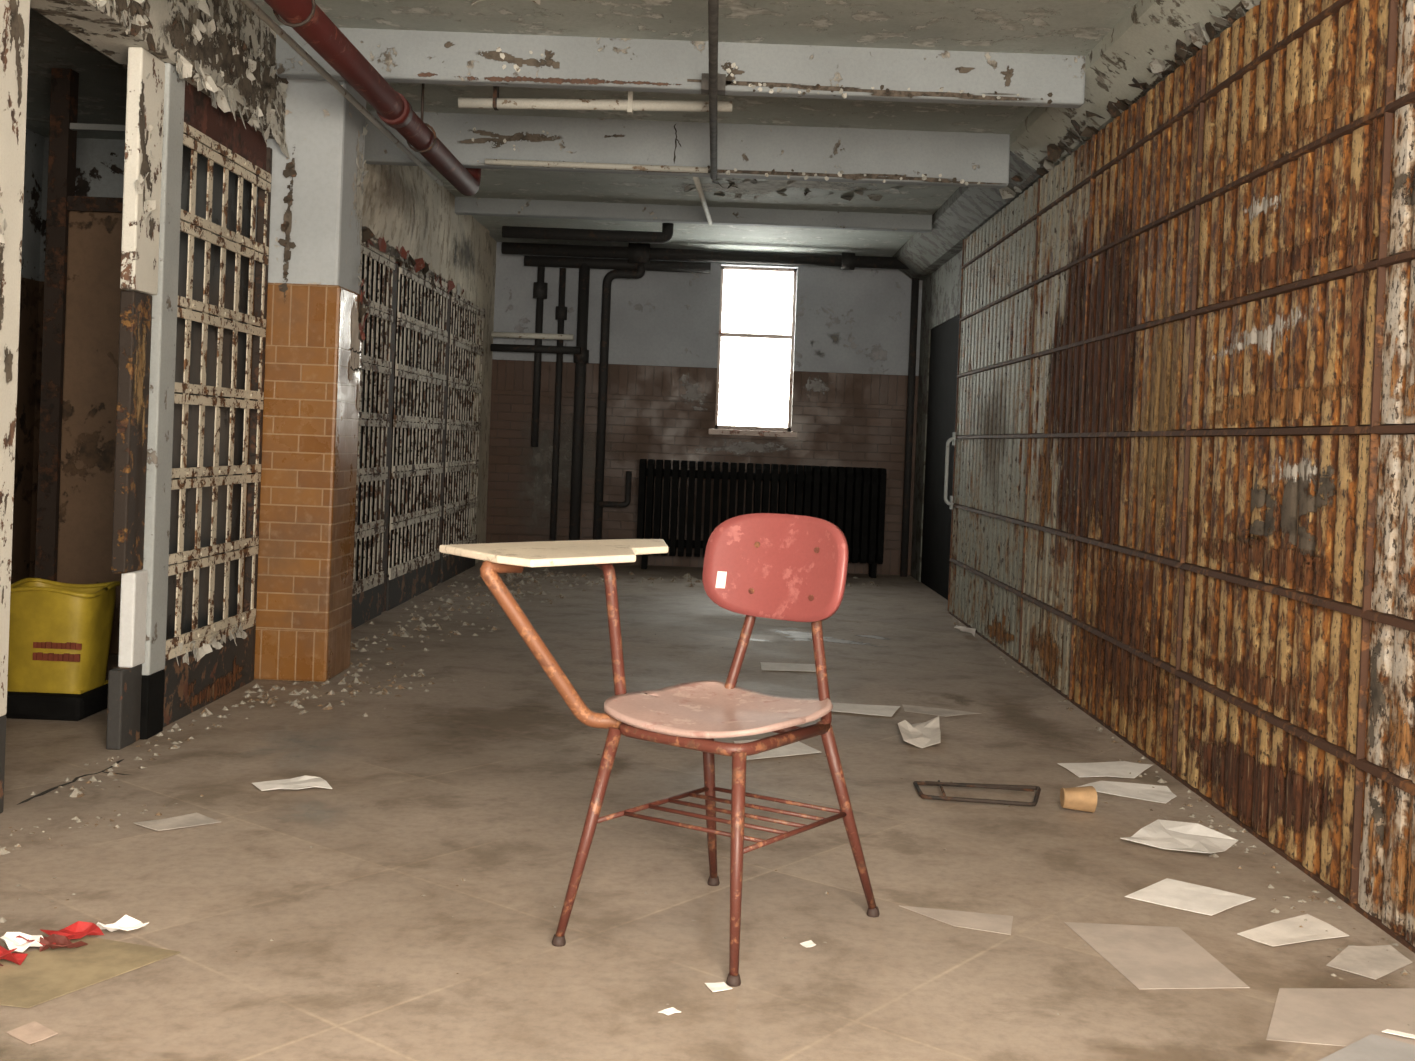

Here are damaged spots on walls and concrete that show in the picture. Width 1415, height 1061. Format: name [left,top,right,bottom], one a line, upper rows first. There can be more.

peeling [9,0,25,108]
peeling [93,0,297,298]
peeling [458,127,561,167]
peeling [478,47,560,72]
peeling [628,0,1261,204]
corrosion [1204,25,1379,466]
peeling [4,347,13,383]
corrosion [1034,207,1183,723]
corrosion [1197,486,1353,595]
corrosion [1398,504,1415,598]
corrosion [1190,606,1347,735]
corrosion [1189,701,1330,834]